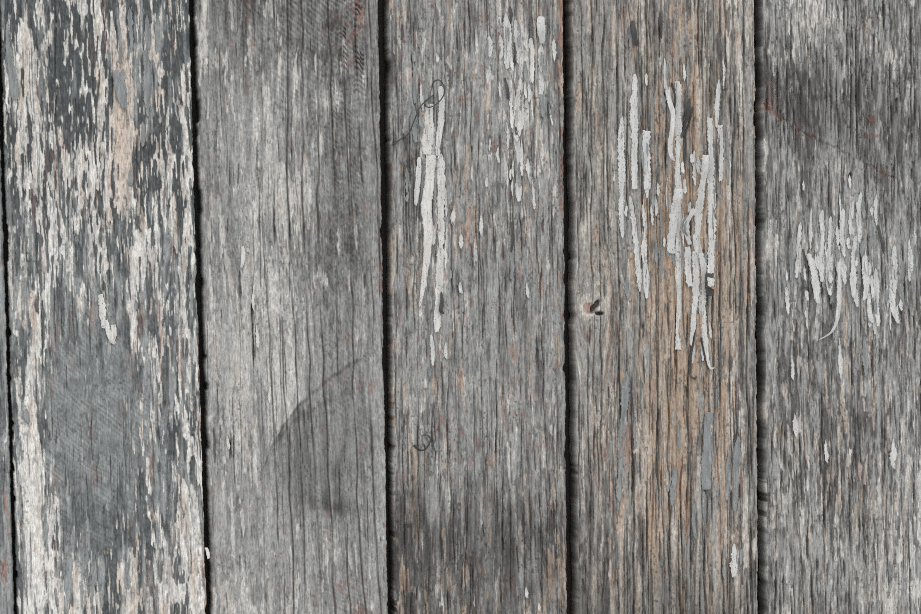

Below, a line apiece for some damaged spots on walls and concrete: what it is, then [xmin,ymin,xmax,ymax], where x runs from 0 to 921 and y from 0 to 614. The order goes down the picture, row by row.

peeling [4,0,221,345]
peeling [403,51,470,378]
peeling [479,4,560,280]
peeling [613,0,755,380]
peeling [767,0,853,74]
peeling [785,174,919,382]
peeling [13,339,337,614]